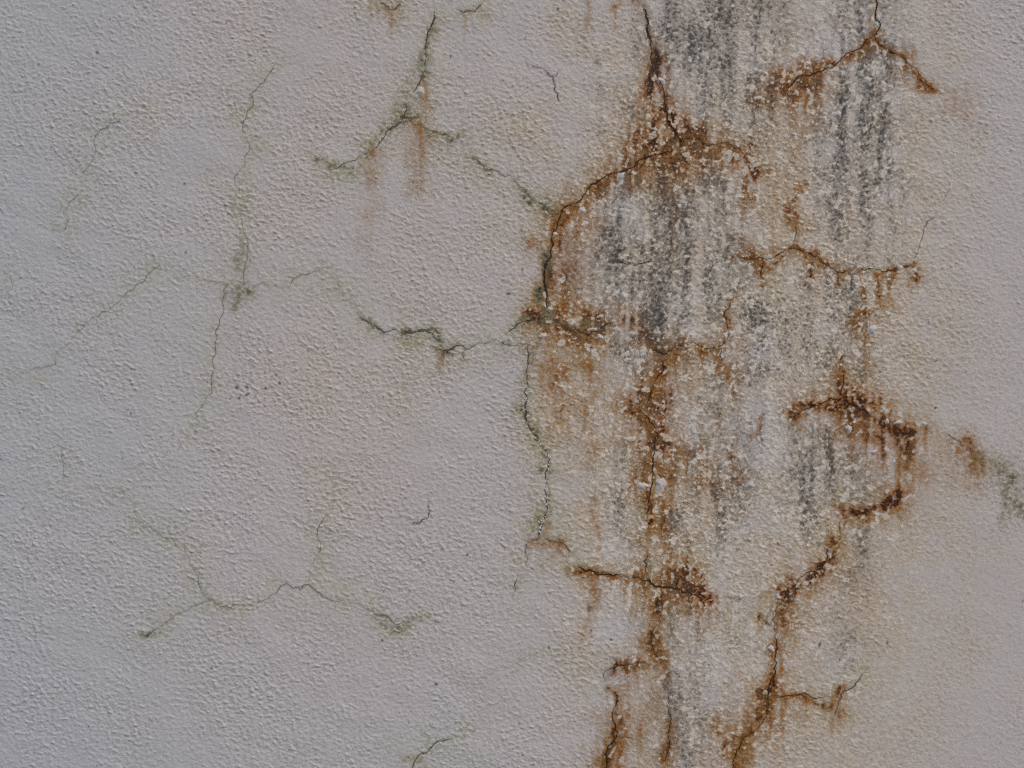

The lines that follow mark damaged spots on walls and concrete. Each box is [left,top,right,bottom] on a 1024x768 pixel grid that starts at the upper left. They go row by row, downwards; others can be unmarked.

damp [661,0,737,118]
corrosion [746,30,938,112]
crack [782,0,937,107]
damp [836,0,894,220]
crack [193,4,742,768]
corrosion [521,28,769,677]
damp [595,172,724,345]
crack [636,212,934,528]
crack [733,501,893,768]
corrosion [711,370,928,768]
damp [799,421,842,514]
corrosion [850,267,897,345]